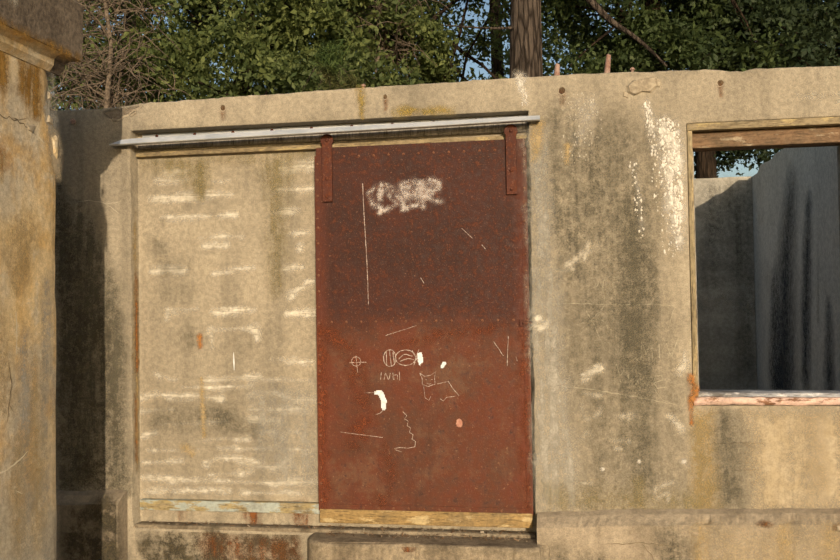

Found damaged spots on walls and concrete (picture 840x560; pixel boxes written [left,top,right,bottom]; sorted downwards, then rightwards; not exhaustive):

damp [0,50,8,91]
damp [19,59,41,118]
crack [0,114,43,142]
damp [560,93,685,507]
damp [45,185,128,489]
rust [317,328,329,504]
rust [689,374,699,424]
damp [65,494,121,560]